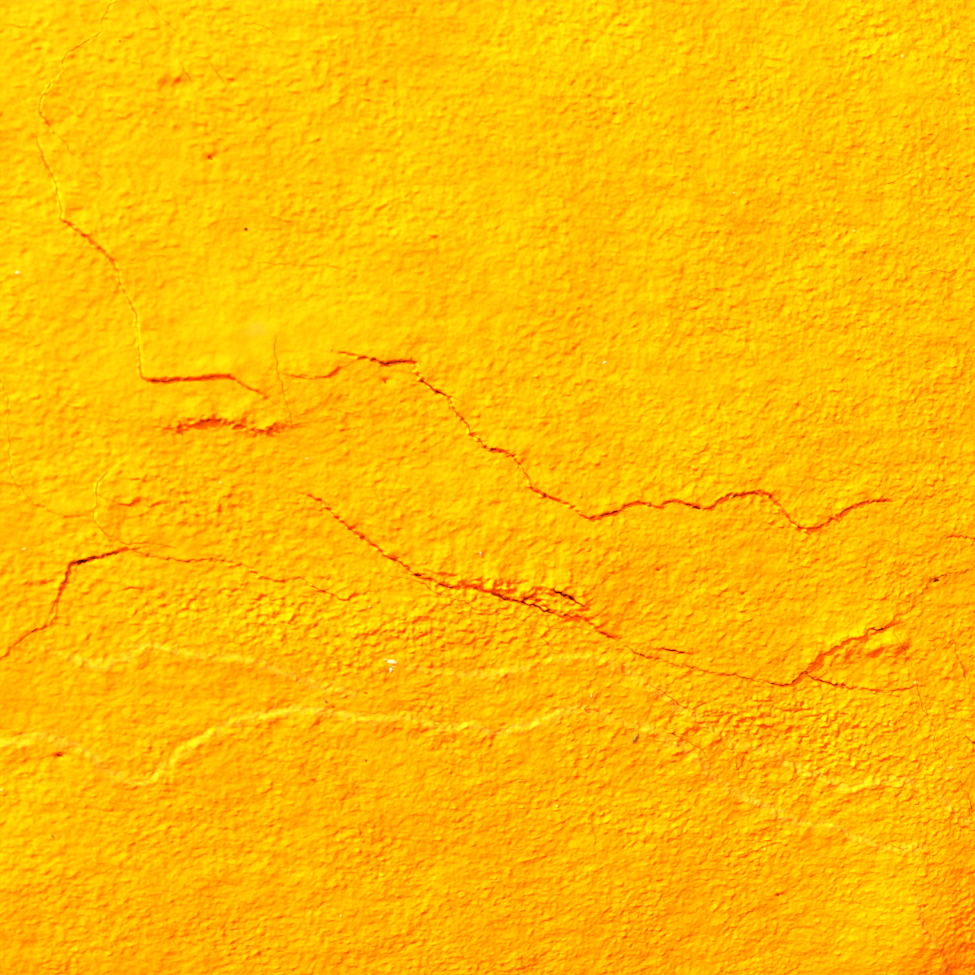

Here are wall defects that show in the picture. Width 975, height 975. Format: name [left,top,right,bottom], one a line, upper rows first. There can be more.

crack [36,2,975,540]
crack [0,380,975,825]